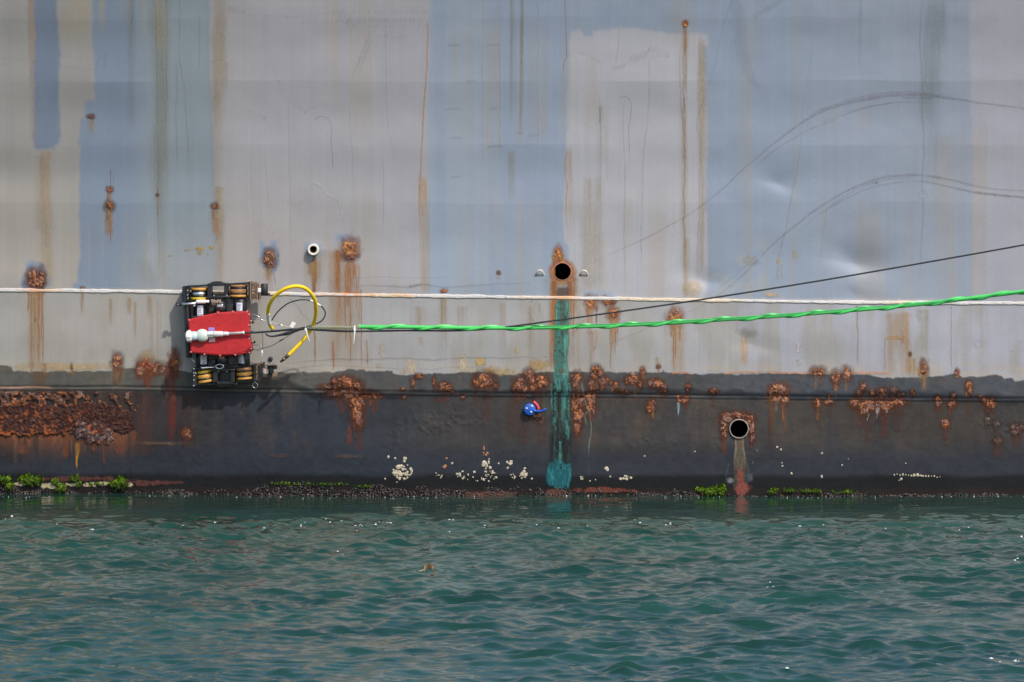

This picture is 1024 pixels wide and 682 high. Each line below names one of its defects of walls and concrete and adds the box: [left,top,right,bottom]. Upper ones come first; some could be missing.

rust [27,268,46,348]
rust [263,249,275,269]
rust [334,238,362,330]
rust [400,248,619,400]
rust [0,363,138,466]
rust [320,376,383,445]
leakage [546,288,571,489]
rust [570,365,691,435]
rust [720,412,755,442]
rust [811,367,915,420]
rust [935,369,1024,445]
leakage [727,438,752,496]